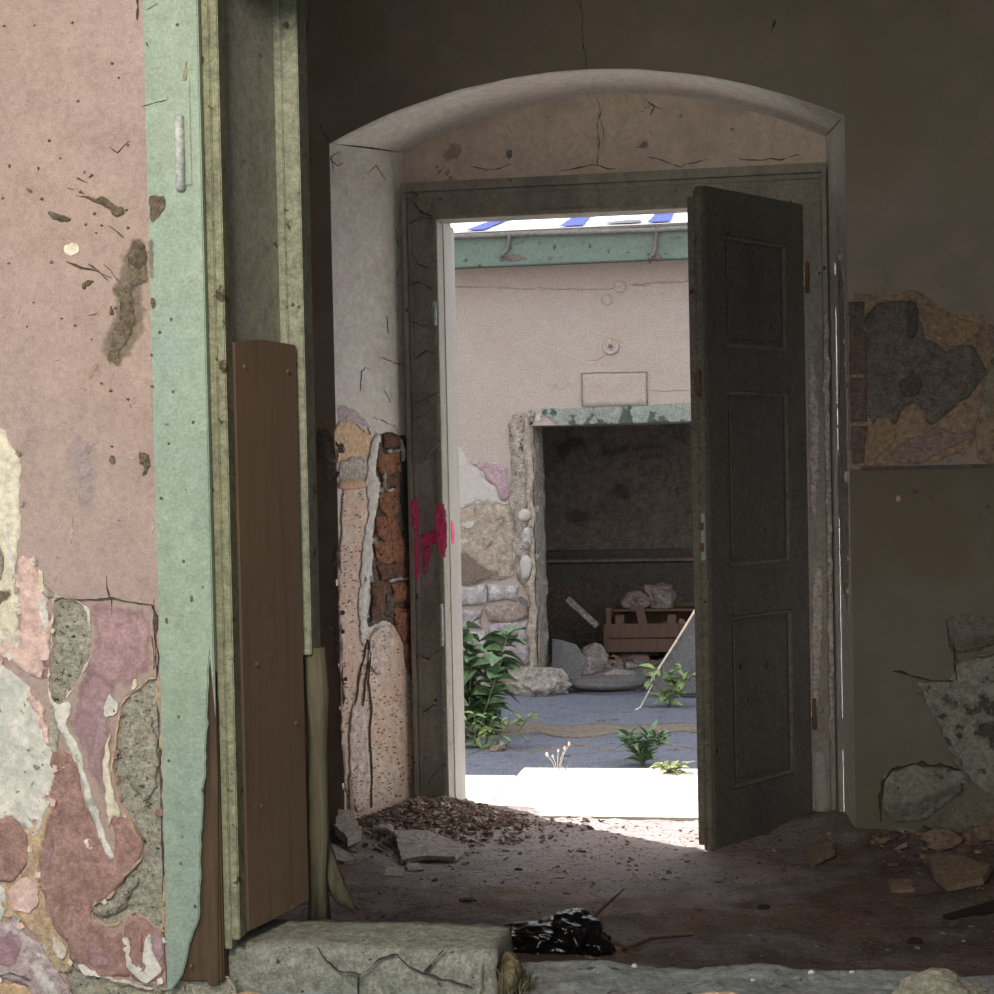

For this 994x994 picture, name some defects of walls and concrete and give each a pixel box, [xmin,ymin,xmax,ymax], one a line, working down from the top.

crack [594,96,604,163]
crack [64,576,160,677]
peeling [0,428,237,994]
crack [157,704,167,985]
flaking render [315,406,412,710]
crack [318,947,473,994]
flaking render [459,410,549,667]
flaking render [808,248,994,812]